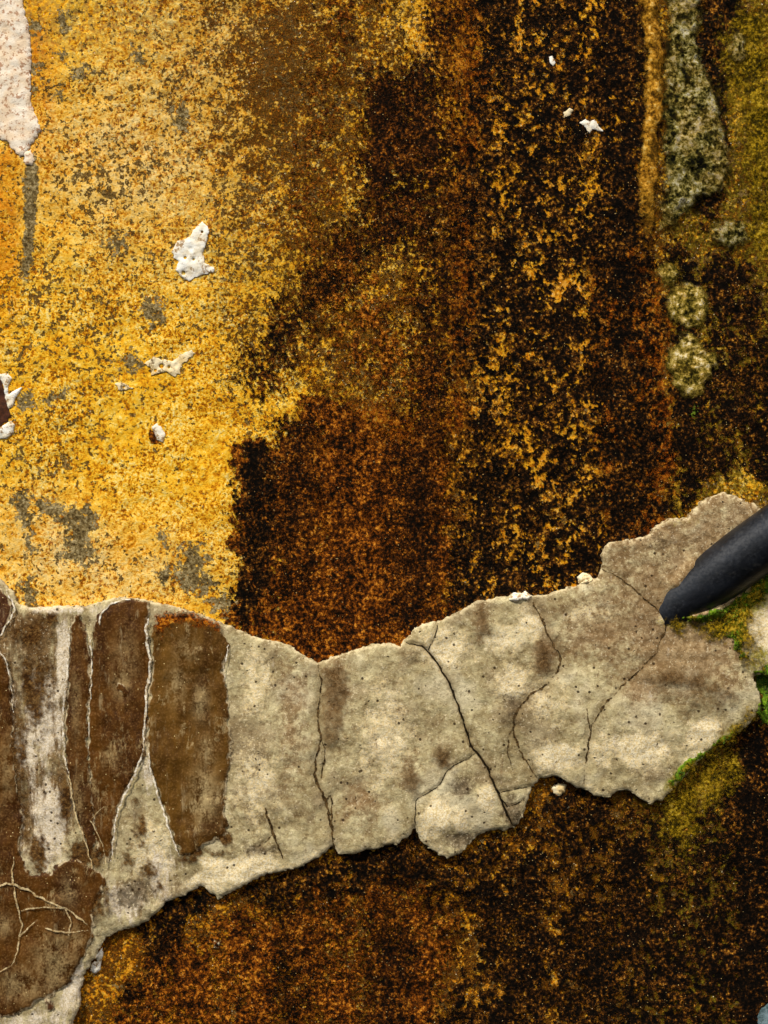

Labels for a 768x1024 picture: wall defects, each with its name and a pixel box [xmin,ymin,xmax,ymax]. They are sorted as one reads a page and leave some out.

flaking render [0,0,96,284]
flaking render [0,373,75,439]
flaking render [112,350,196,391]
flaking render [172,222,215,282]
corrosion [279,0,496,659]
leakage [216,0,768,745]
corrosion [583,233,680,539]
corrosion [154,610,220,641]
crack [313,665,335,849]
crack [406,602,562,826]
crack [584,568,680,780]
crack [0,857,88,972]